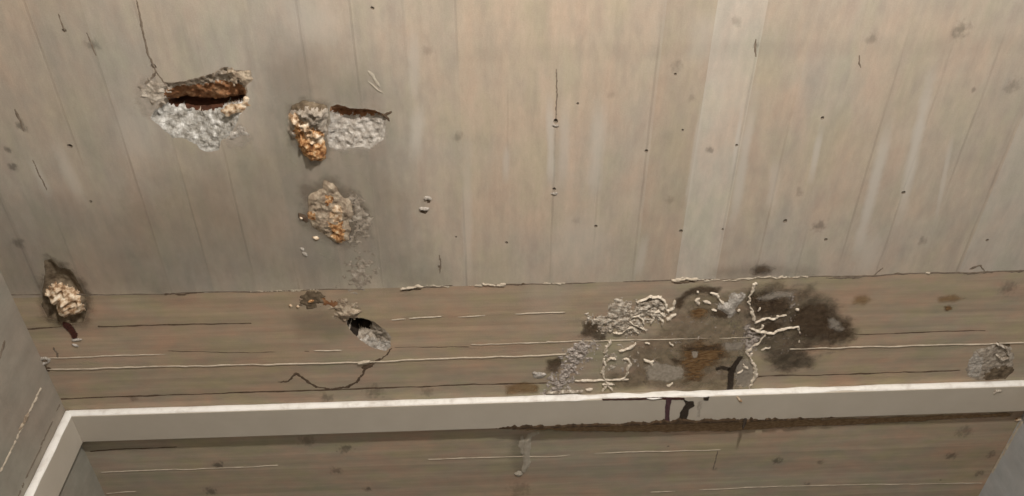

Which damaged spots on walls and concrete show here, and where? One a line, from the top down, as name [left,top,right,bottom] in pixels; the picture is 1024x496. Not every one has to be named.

crack [136,0,168,89]
spalling [137,67,253,152]
spalling [327,104,392,151]
spalling [41,259,87,323]
crack [280,348,392,390]
spalling [346,318,391,351]
water stain [539,286,850,422]
corrosion [496,413,1011,433]